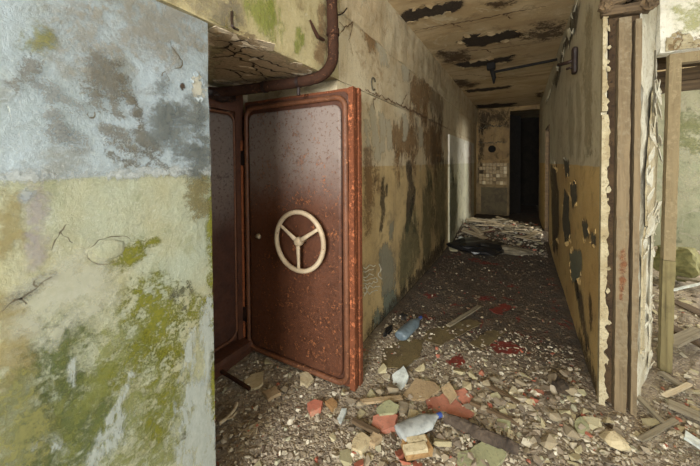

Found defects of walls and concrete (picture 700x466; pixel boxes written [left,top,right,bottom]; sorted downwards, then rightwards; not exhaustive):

crack [213,40,297,81]
spalling [401,0,463,25]
spalling [457,29,527,47]
damp [6,52,212,222]
crack [0,276,52,313]
damp [0,250,114,388]
crack [52,224,73,249]
crack [87,236,130,265]
damp [32,281,216,466]
damp [367,75,454,338]
flaking render [550,16,611,406]
peeling [640,79,663,368]